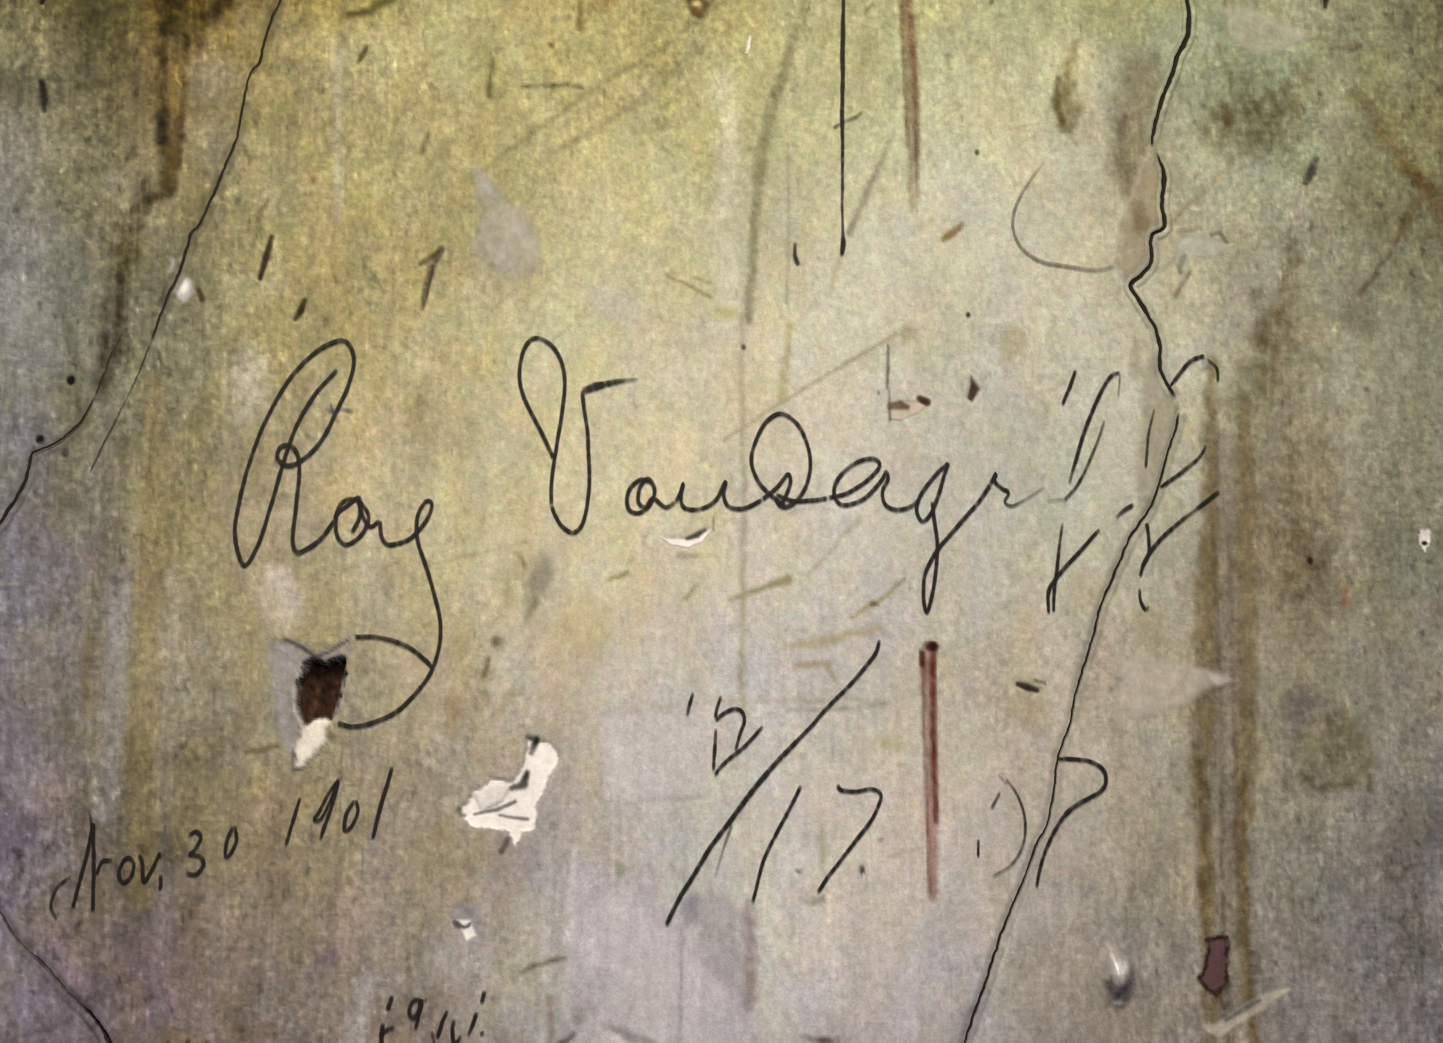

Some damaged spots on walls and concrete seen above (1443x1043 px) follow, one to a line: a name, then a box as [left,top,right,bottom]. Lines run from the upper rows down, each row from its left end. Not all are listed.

rust [902,0,919,158]
crack [0,0,282,534]
crack [963,0,1196,1043]
spalling [268,639,348,768]
spalling [459,736,559,852]
rust [920,642,938,899]
leakage [1191,359,1257,1043]
crack [0,900,118,1043]
spalling [1198,936,1229,997]